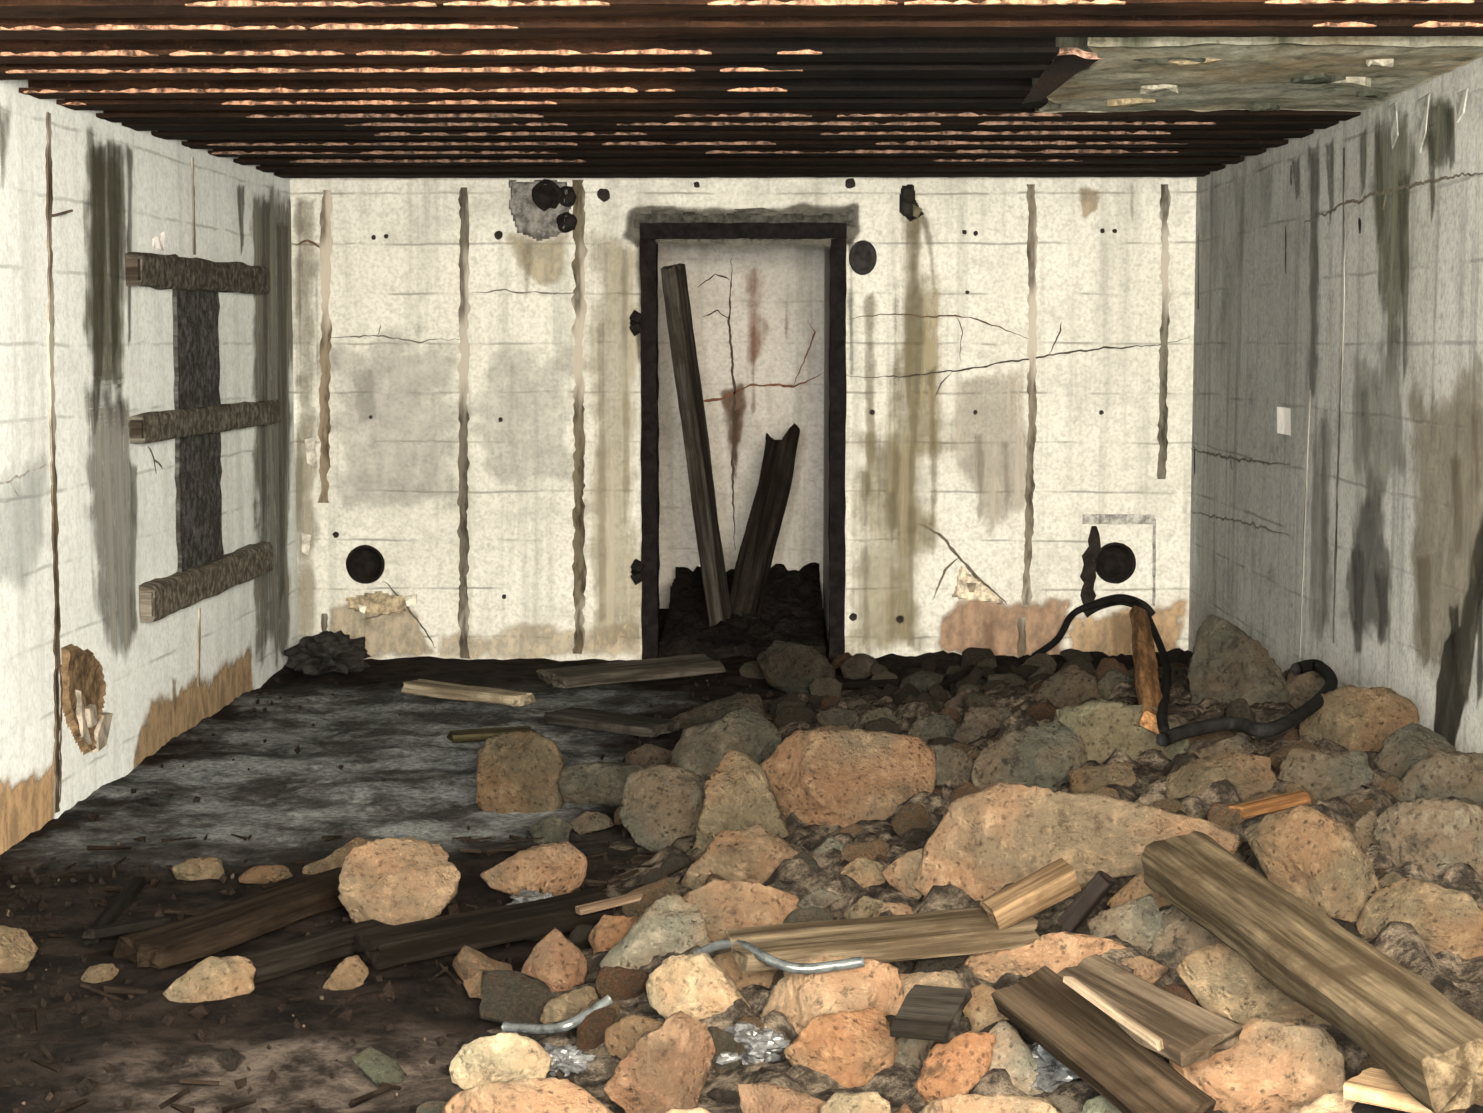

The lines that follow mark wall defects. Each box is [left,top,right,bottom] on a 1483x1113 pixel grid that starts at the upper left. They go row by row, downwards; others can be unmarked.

water stain [85,132,137,655]
corrosion [722,384,746,462]
corrosion [750,315,759,359]
crack [698,260,1190,549]
water stain [1293,144,1333,394]
water stain [1361,98,1455,383]
spalling [346,591,417,615]
spalling [952,566,1003,604]
water stain [1347,470,1390,651]
water stain [1410,374,1483,747]
spalling [61,644,113,755]